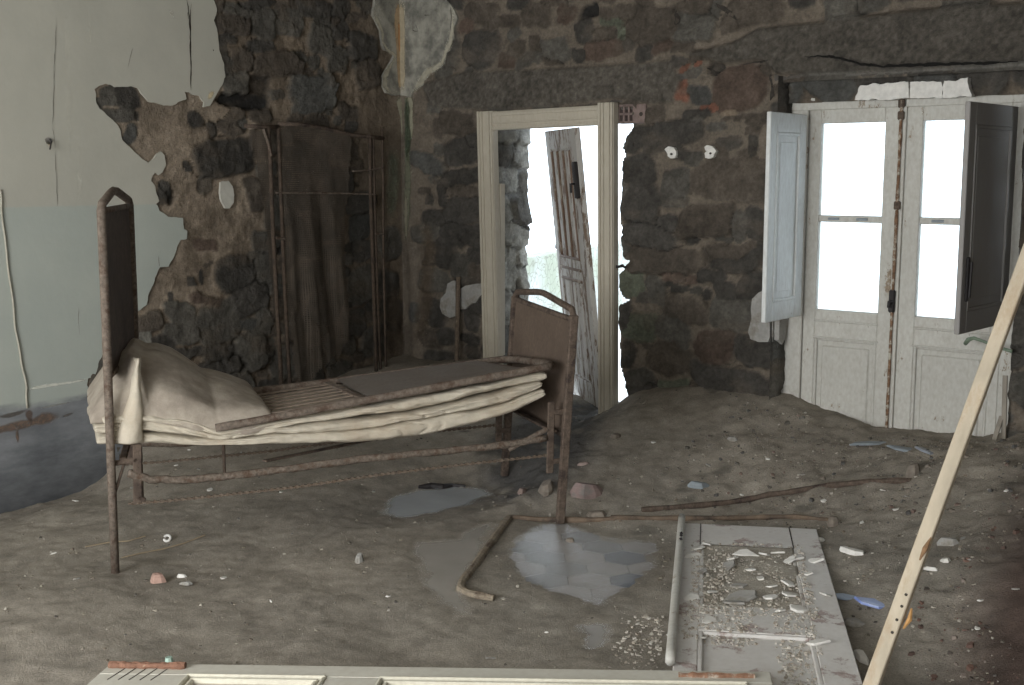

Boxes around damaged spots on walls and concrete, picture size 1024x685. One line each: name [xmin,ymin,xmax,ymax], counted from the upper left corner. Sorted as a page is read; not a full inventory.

crack [810,55,1018,68]
flaking render [95,0,459,397]
flaking render [87,355,103,397]